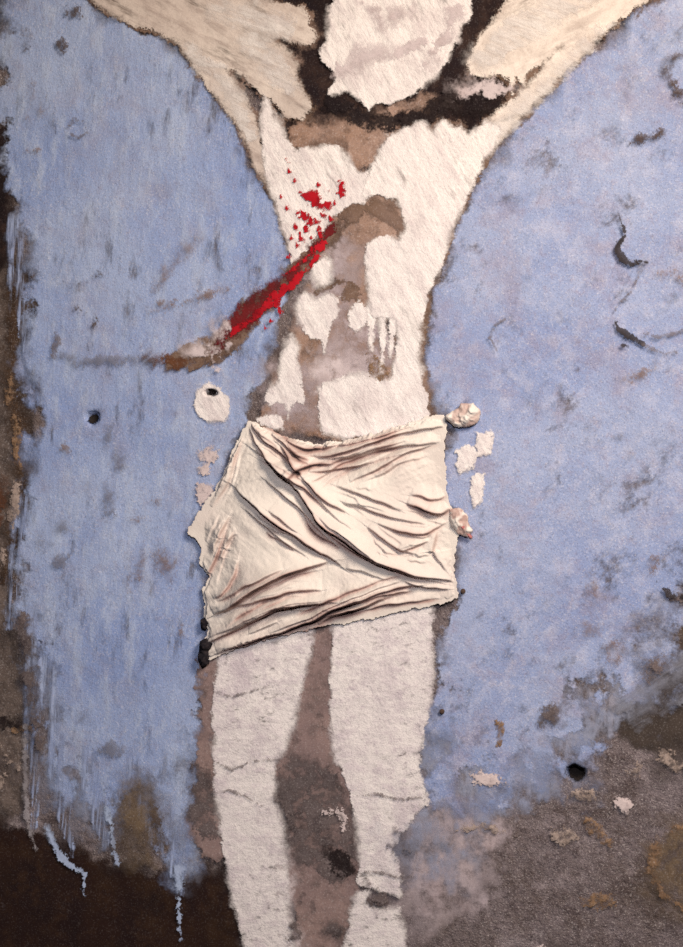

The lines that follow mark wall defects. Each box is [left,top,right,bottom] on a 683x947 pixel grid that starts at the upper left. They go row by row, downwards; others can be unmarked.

crack [614,217,683,354]
peeling [537,703,560,728]
flaking render [494,720,505,747]
flaking render [656,749,683,772]
flaking render [468,769,510,787]
flaking render [567,787,598,801]
flaking render [614,797,634,814]
peeling [386,828,420,860]
flaking render [550,817,612,847]